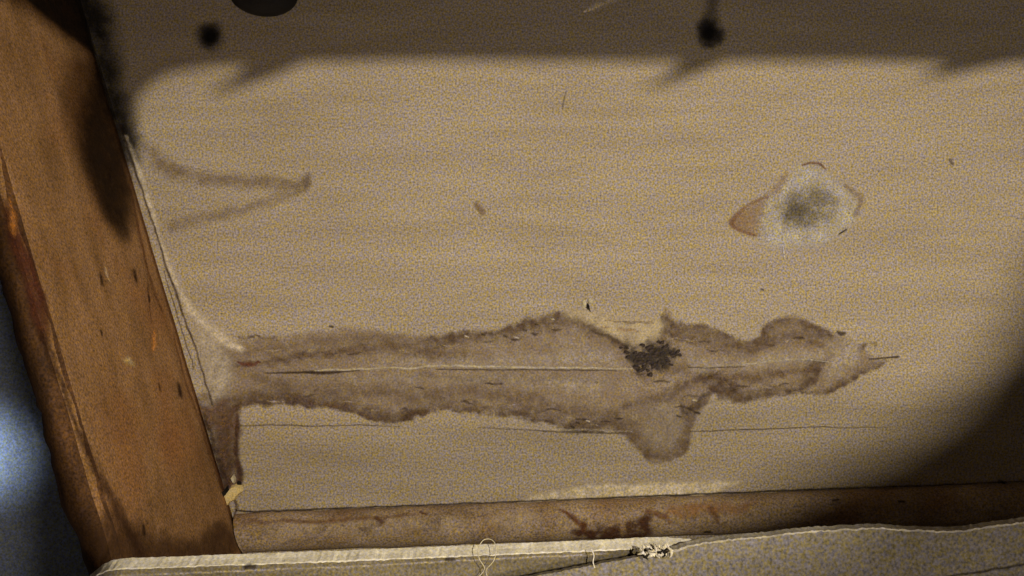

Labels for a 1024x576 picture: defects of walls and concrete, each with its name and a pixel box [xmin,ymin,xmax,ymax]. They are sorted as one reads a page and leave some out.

damp [502,319,538,340]
damp [588,317,691,382]
damp [677,368,822,417]
damp [199,395,428,489]
damp [502,404,638,442]
rust [563,511,666,541]